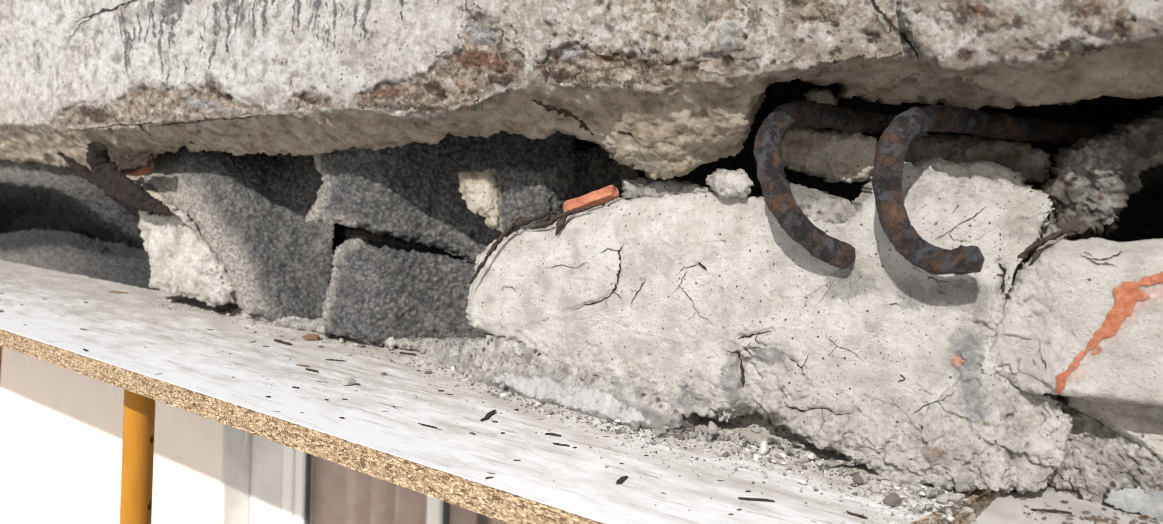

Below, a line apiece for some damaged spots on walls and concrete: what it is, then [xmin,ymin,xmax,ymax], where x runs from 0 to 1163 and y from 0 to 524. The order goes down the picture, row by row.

crack [68,0,137,40]
water stain [117,0,278,84]
water stain [291,0,371,48]
corrosion [57,141,177,217]
spalling [128,167,153,177]
crack [548,246,645,310]
crack [674,262,712,322]
crack [1079,251,1122,266]
crack [727,331,770,387]
crack [789,335,859,376]
spalling [1055,272,1163,462]
crack [788,406,852,422]